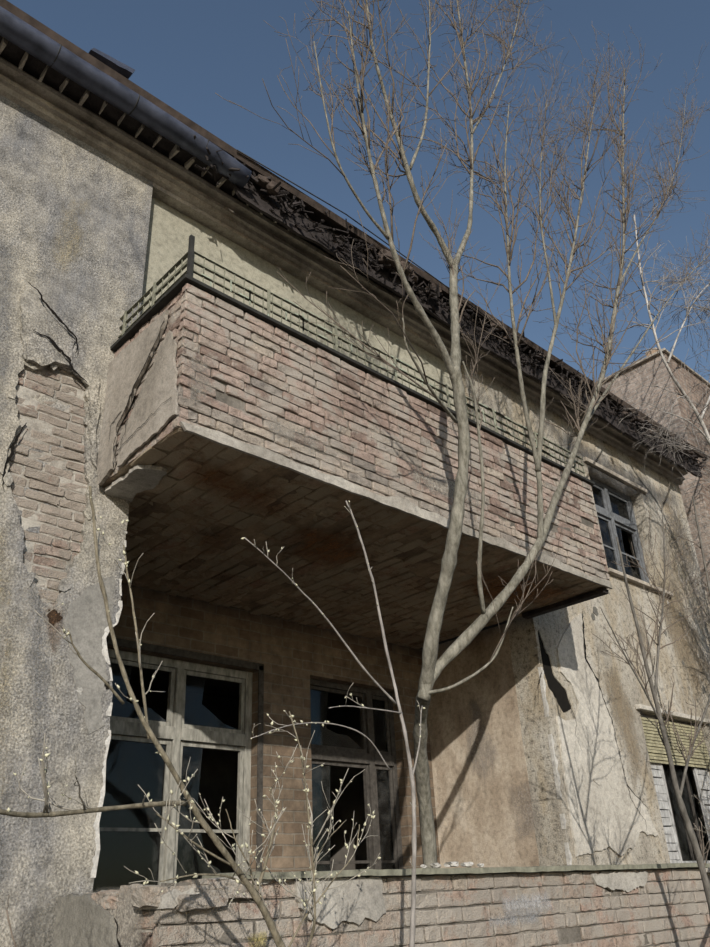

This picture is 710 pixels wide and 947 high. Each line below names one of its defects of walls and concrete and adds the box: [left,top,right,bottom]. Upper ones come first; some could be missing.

flaking render [3,363,92,625]
crack [97,309,178,486]
flaking render [537,606,658,865]
crack [582,611,648,834]
flaking render [590,871,648,892]